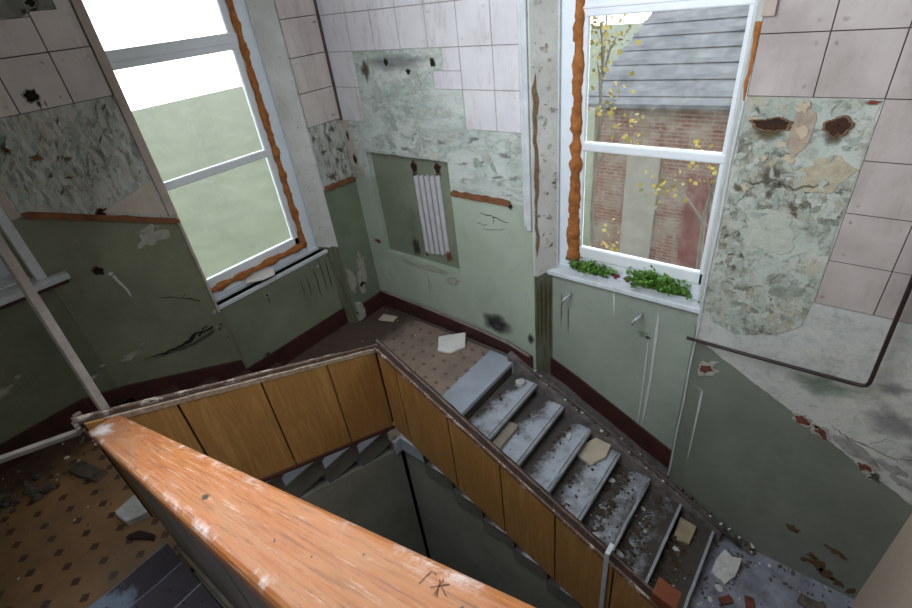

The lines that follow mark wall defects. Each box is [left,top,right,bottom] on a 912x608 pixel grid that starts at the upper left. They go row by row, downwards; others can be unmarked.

flaking render [308,43,557,258]
flaking render [0,88,170,249]
flaking render [702,96,882,335]
crack [144,326,215,360]
flaking render [698,361,720,376]
flaking render [792,411,836,441]
crack [838,430,912,461]
flaking render [854,461,880,483]
peeling [800,552,856,594]